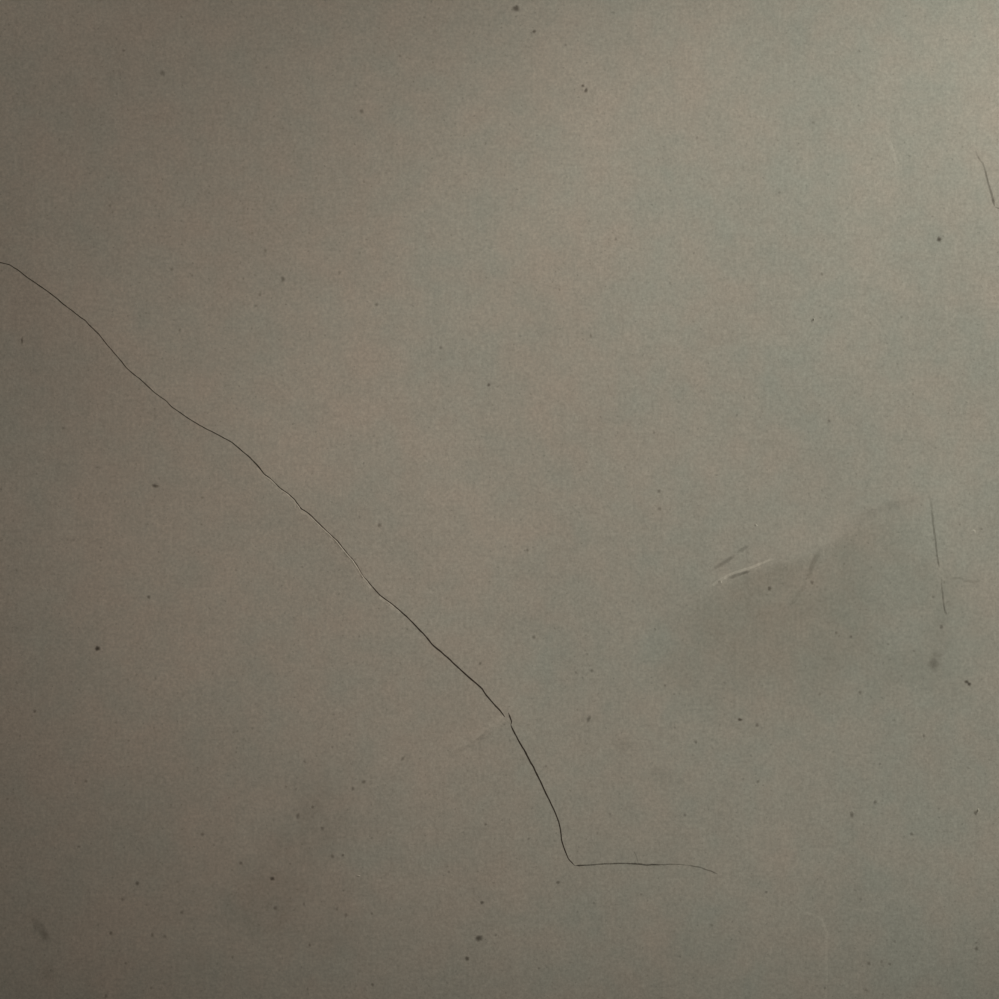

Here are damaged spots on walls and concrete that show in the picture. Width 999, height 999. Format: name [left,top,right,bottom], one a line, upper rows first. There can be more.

crack [0,262,657,866]